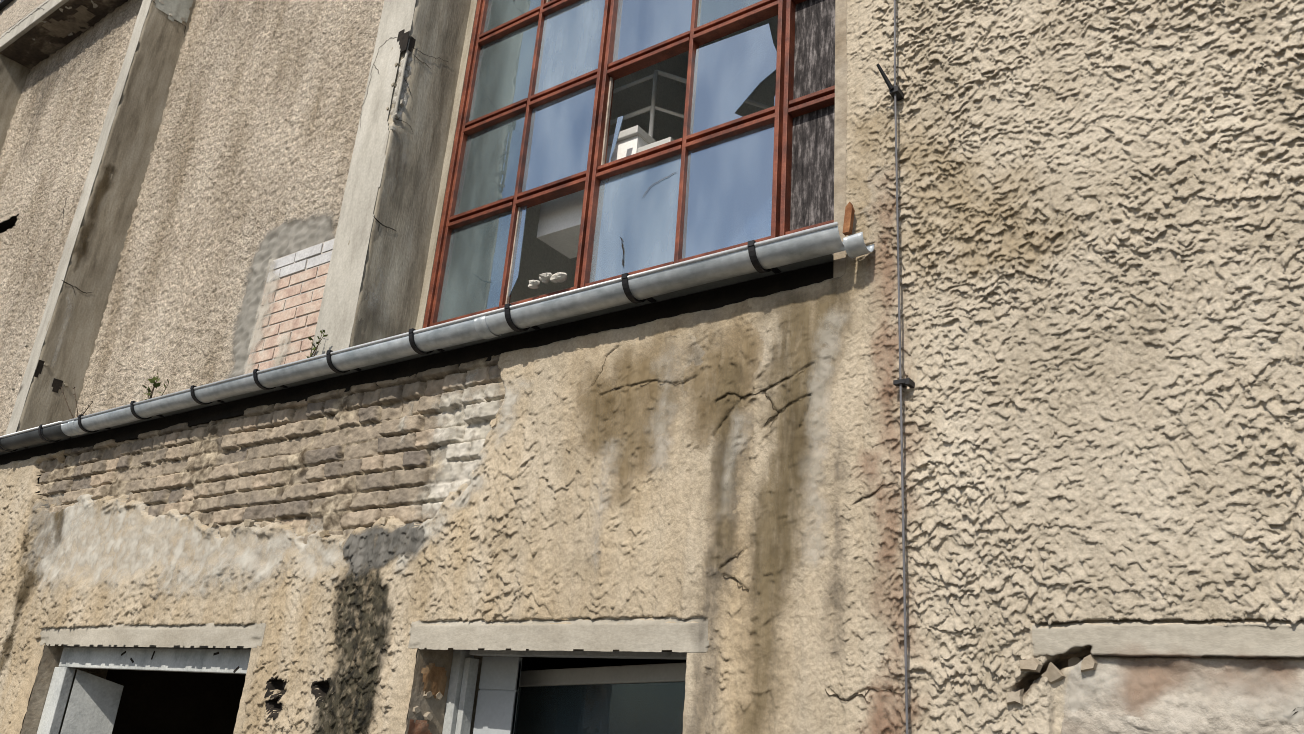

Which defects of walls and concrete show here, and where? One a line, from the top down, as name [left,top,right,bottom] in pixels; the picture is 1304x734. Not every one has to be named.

crack [360,37,448,132]
spalling [11,360,68,393]
water stain [0,494,342,670]
flaking render [36,351,510,544]
flaking render [264,669,290,720]
flaking render [311,674,334,710]
water stain [315,569,391,734]
water stain [397,382,516,565]
water stain [578,328,757,502]
crack [593,349,812,436]
water stain [746,292,845,732]
flaking render [1007,645,1098,705]